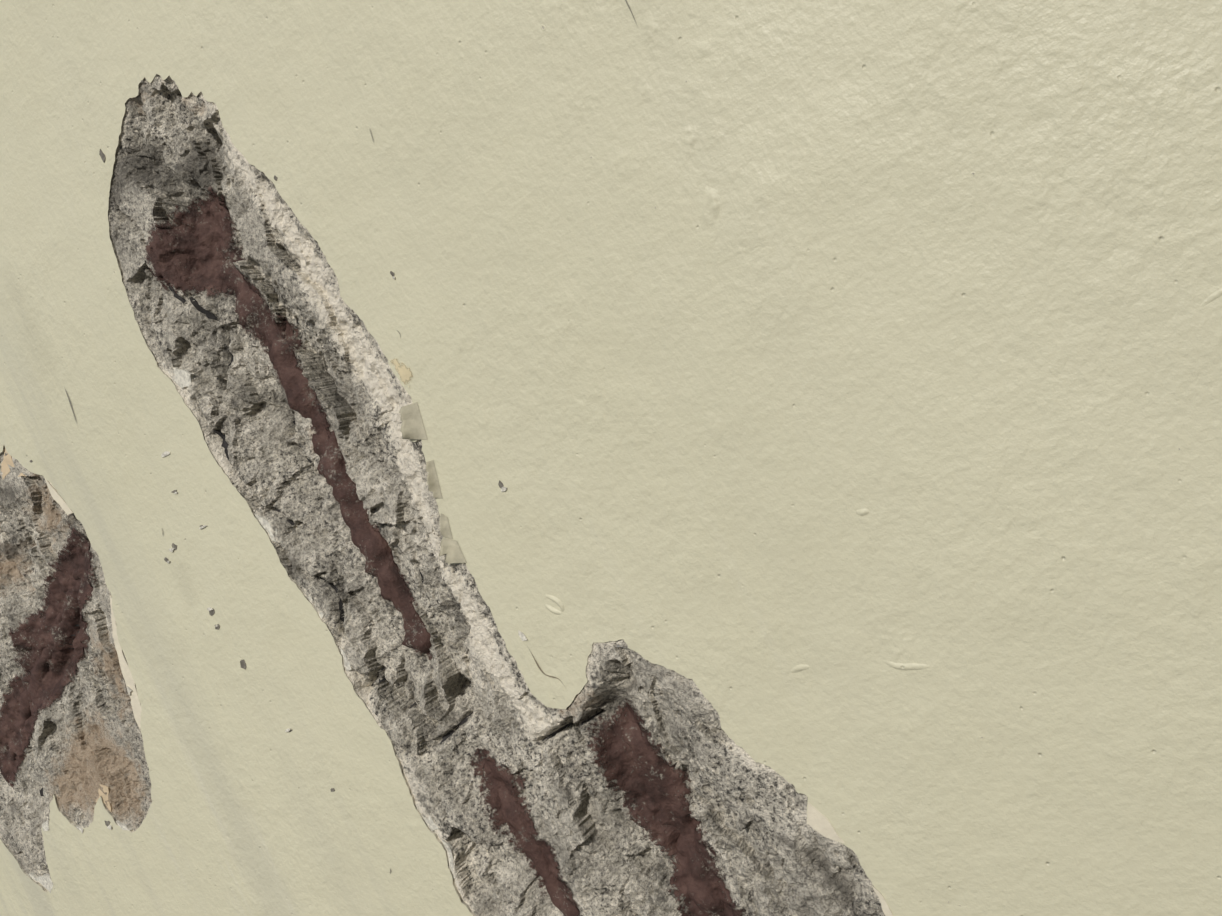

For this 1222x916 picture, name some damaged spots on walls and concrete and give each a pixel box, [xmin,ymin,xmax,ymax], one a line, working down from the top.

corrosion [144,186,305,385]
corrosion [0,520,97,789]
spalling [0,449,152,893]
corrosion [310,392,356,486]
corrosion [391,554,424,624]
spalling [99,74,893,916]
corrosion [469,748,582,916]
corrosion [586,698,746,916]